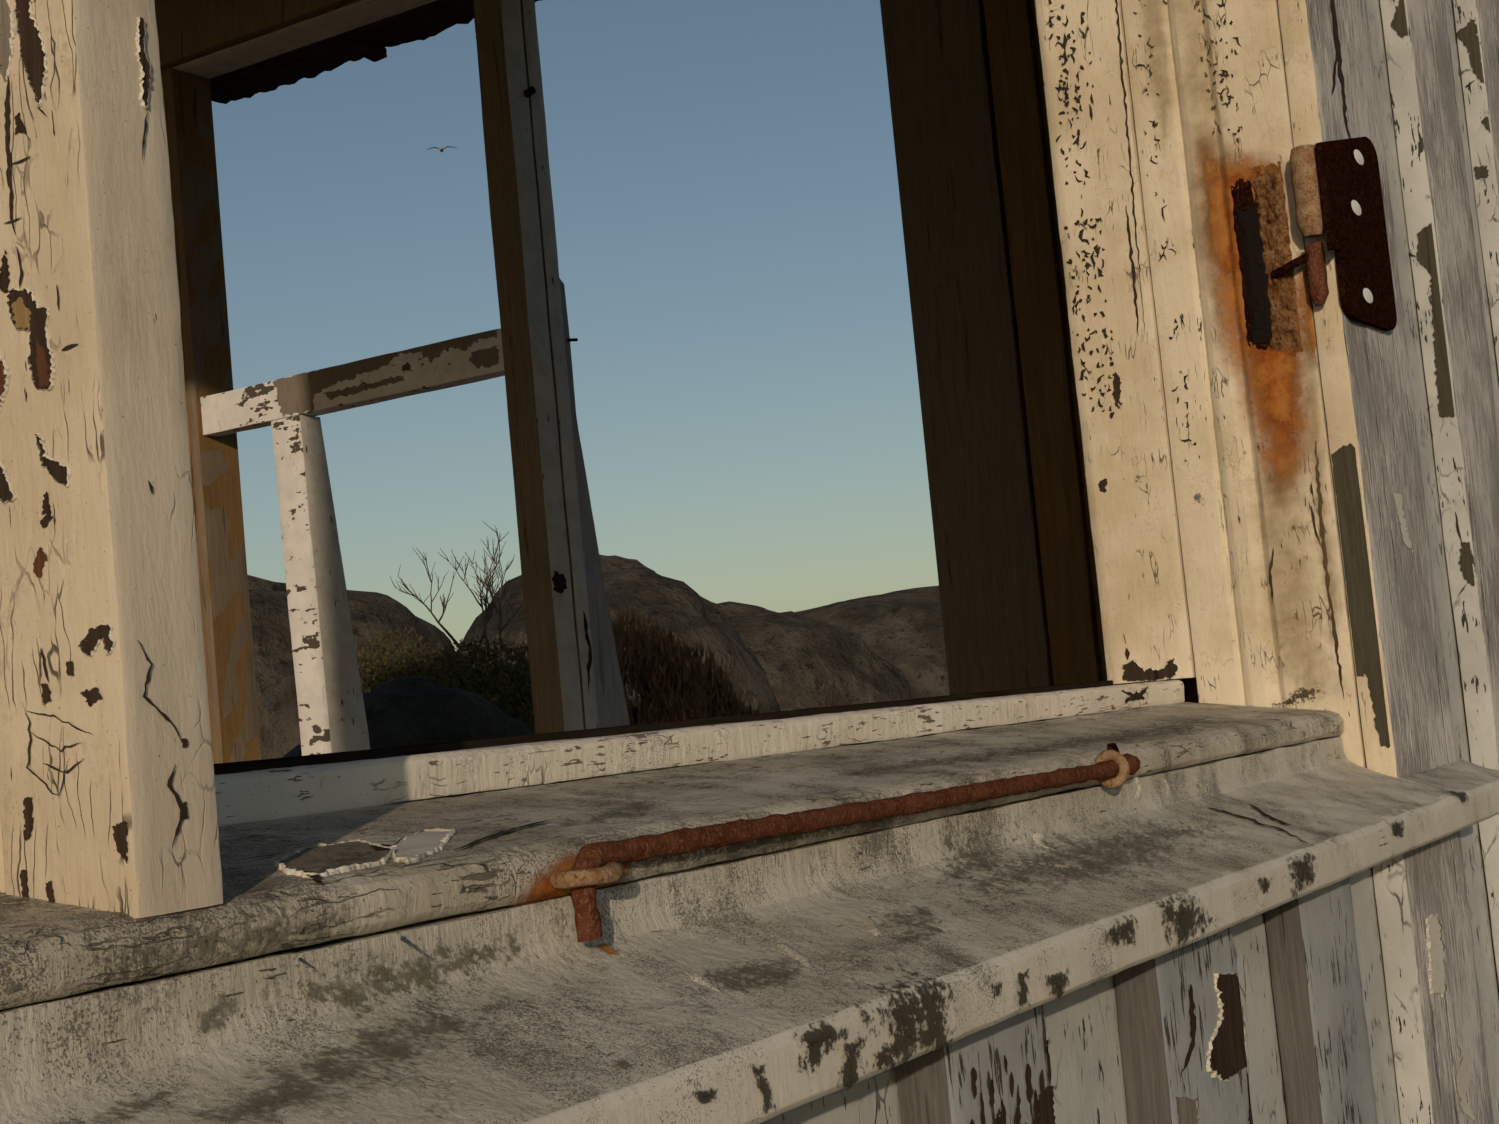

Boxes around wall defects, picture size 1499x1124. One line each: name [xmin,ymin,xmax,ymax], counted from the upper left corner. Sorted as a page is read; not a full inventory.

peeling [0,0,78,391]
peeling [0,351,11,413]
corrosion [1199,145,1317,492]
peeling [0,458,18,504]
peeling [1331,443,1390,748]
crack [23,649,94,796]
crack [137,640,188,848]
peeling [273,819,554,885]
corrosion [525,856,576,904]
corrosion [597,944,618,954]
peeling [970,1040,1056,1124]
peeling [1181,971,1253,1124]